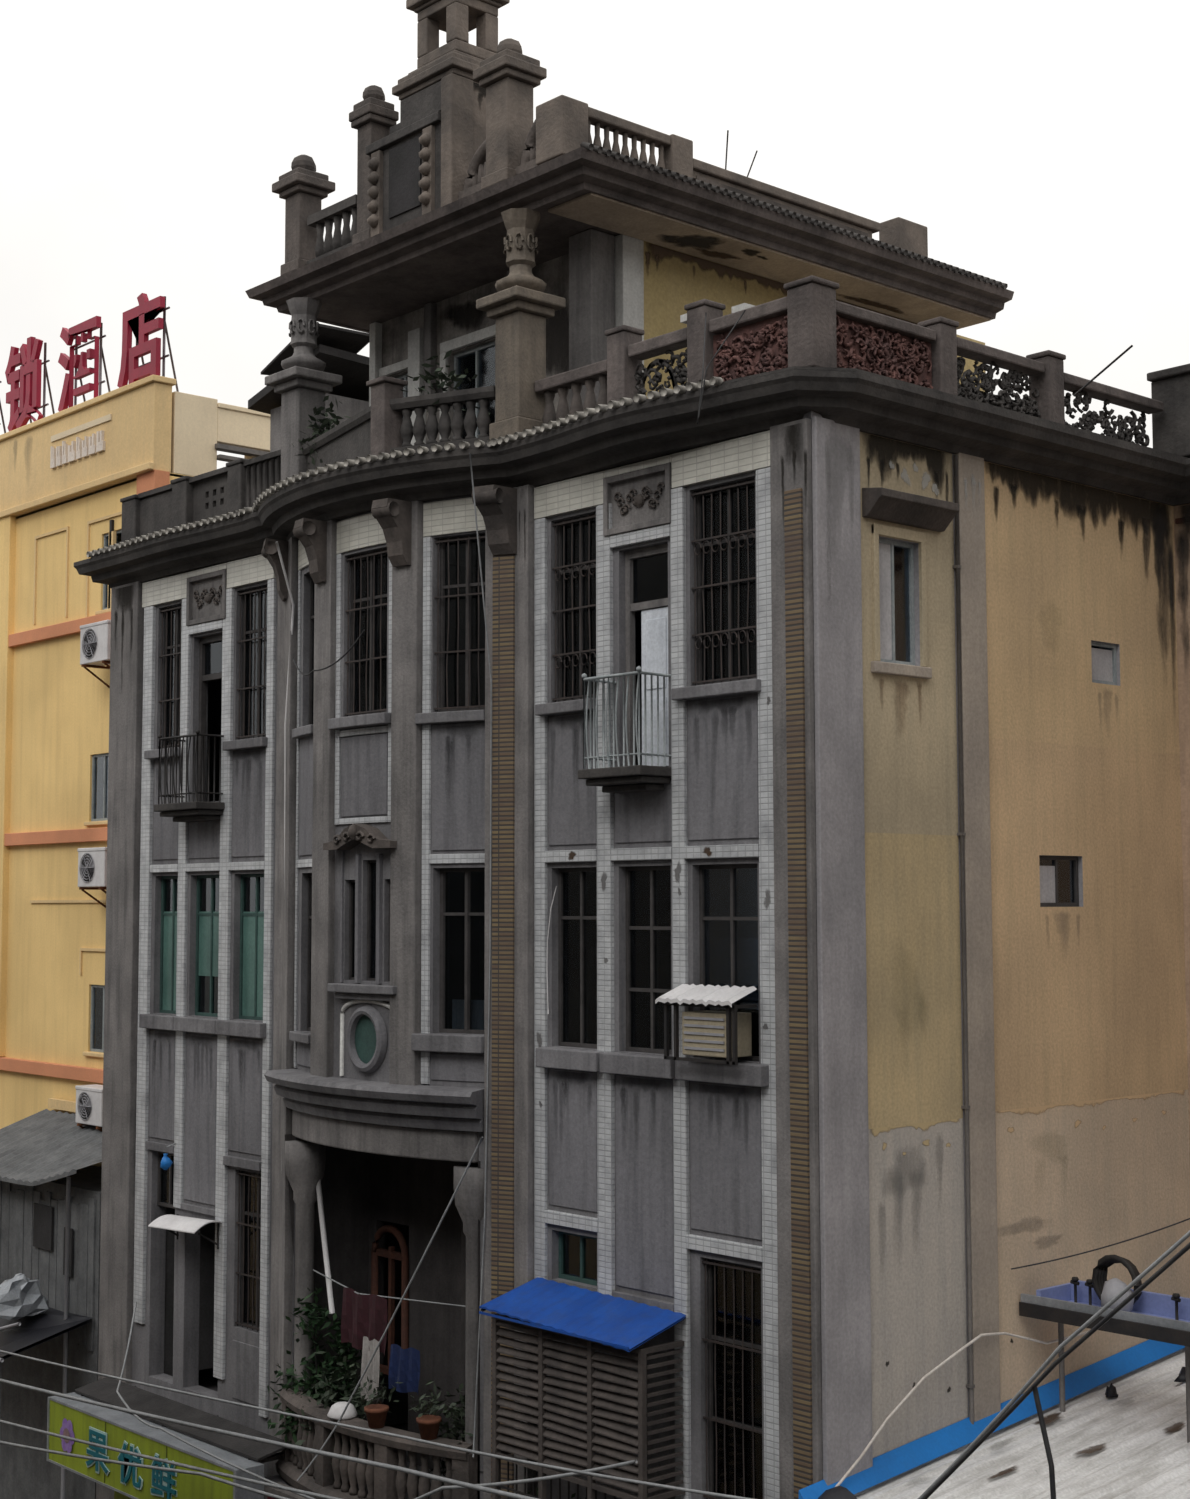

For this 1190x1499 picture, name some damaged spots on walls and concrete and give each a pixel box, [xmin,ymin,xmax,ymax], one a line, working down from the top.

water stain [645,235,788,295]
water stain [867,434,948,501]
water stain [987,462,1190,659]